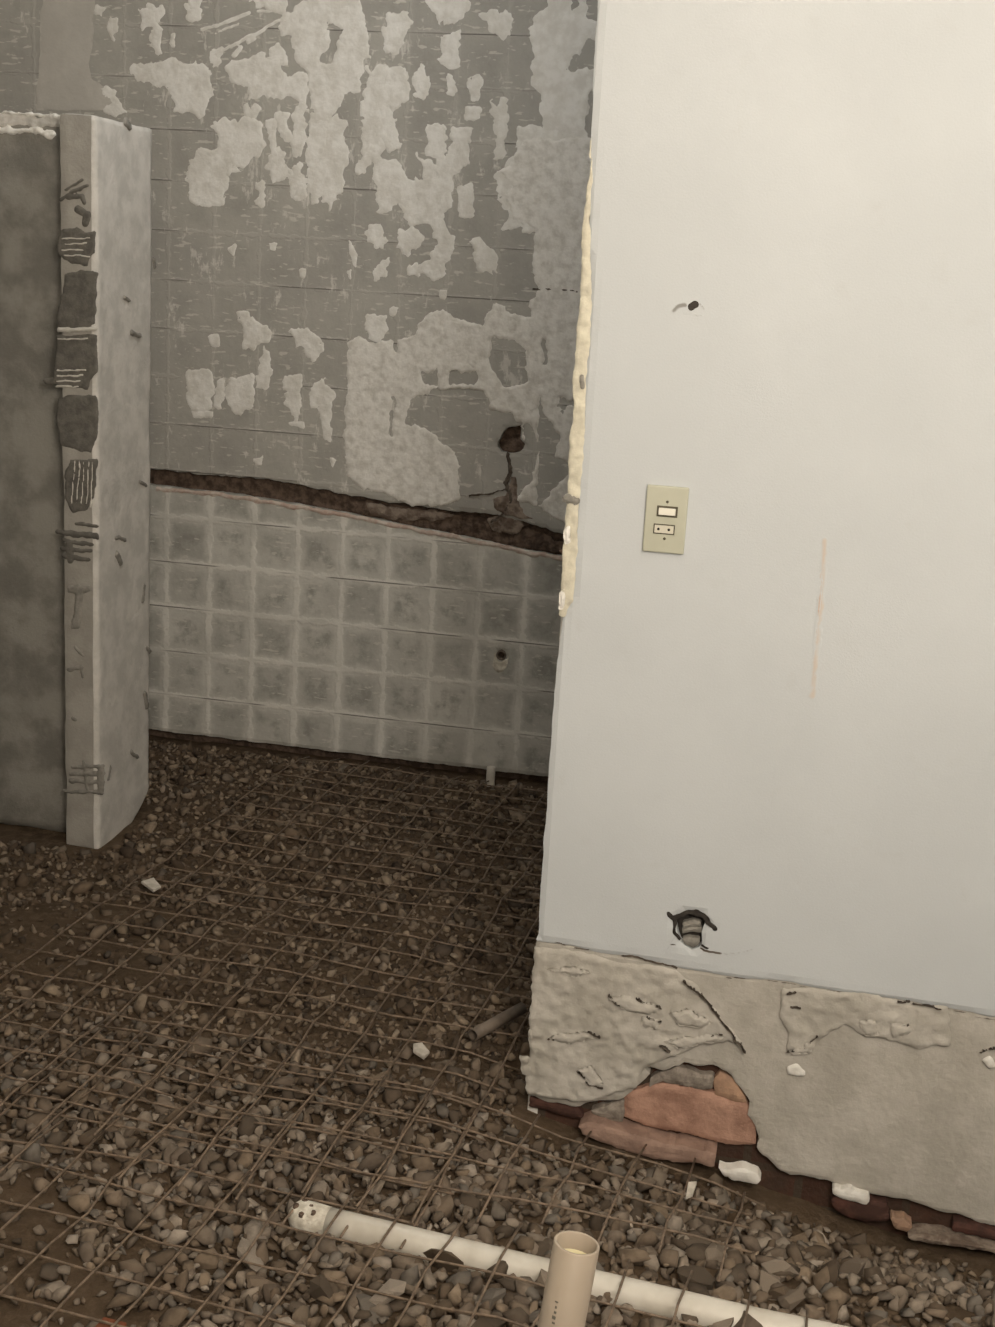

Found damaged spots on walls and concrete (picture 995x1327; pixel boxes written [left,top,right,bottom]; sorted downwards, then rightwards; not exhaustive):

peeling [94,4,119,41]
spalling [0,110,60,140]
peeling [101,85,132,131]
peeling [129,0,597,617]
spalling [115,535,127,566]
spalling [141,877,161,892]
peeling [525,909,761,1184]
peeling [780,987,951,1076]
peeling [979,1046,995,1069]
spalling [686,1181,697,1199]
spalling [831,1182,995,1253]